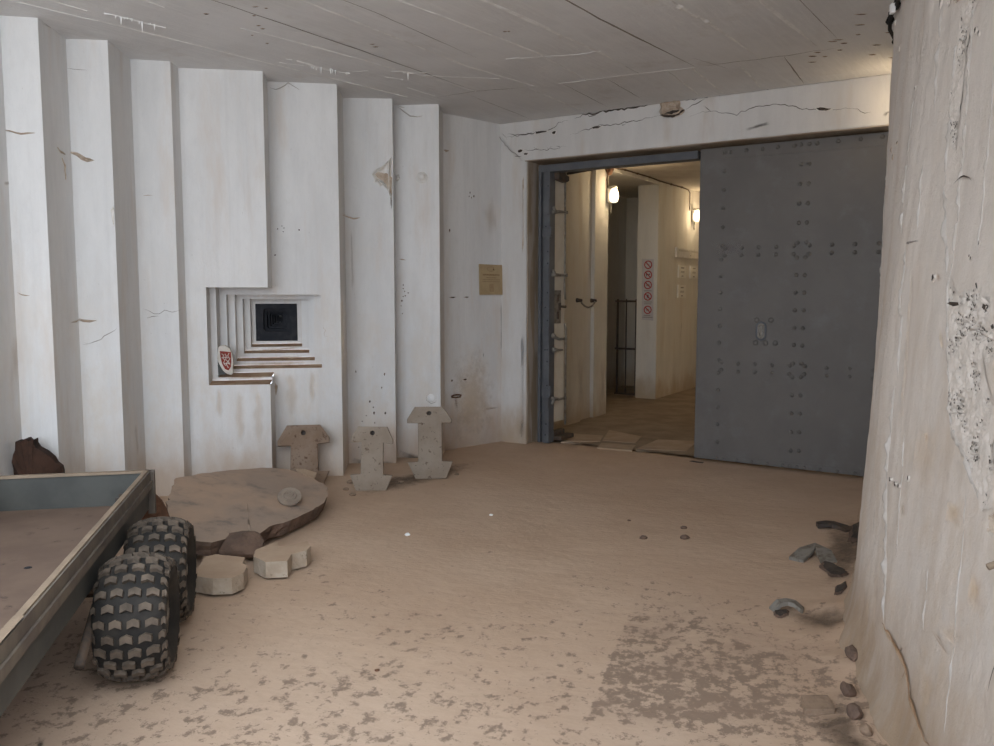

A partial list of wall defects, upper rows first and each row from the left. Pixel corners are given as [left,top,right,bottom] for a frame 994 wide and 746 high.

crack [500,105,655,157]
crack [57,147,93,180]
spalling [372,158,400,208]
crack [71,318,117,345]
spalling [947,283,994,470]
crack [882,623,929,745]